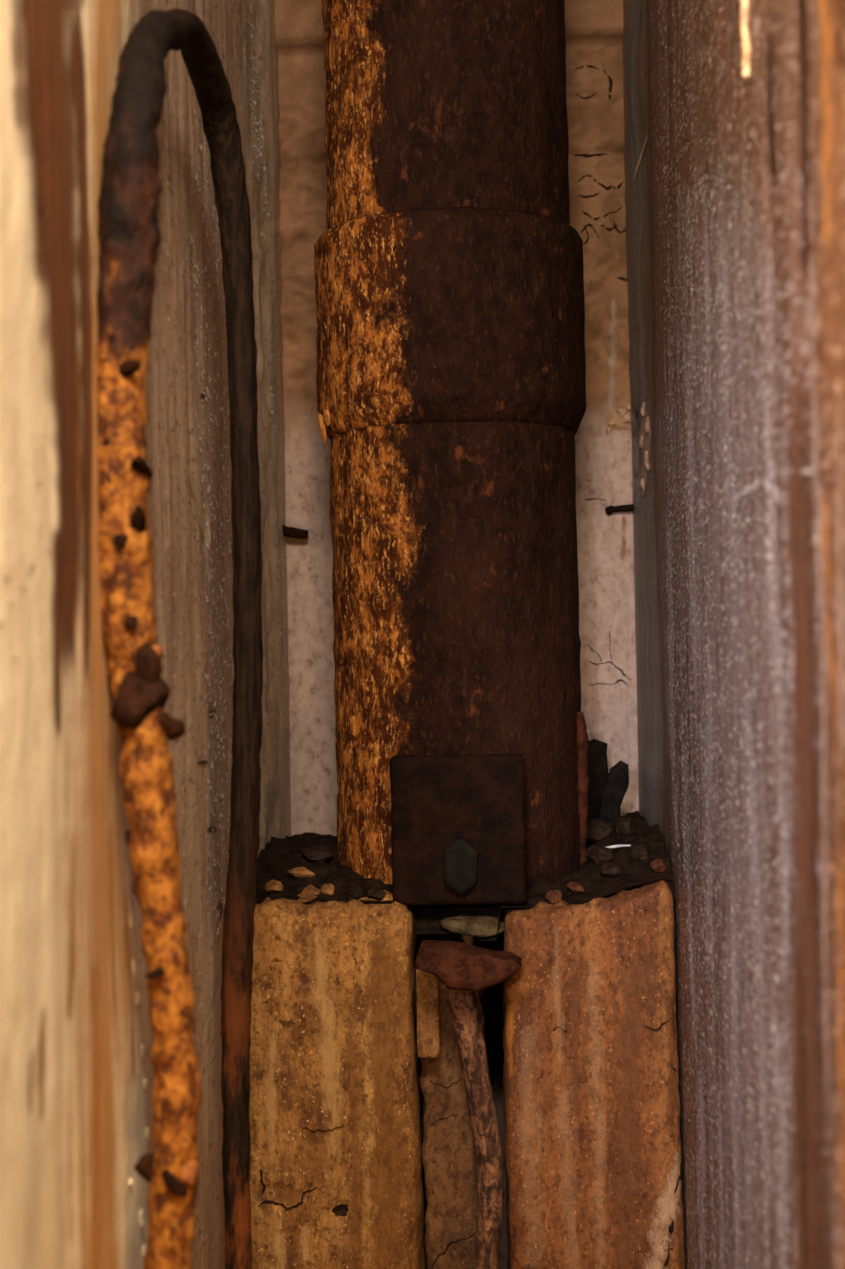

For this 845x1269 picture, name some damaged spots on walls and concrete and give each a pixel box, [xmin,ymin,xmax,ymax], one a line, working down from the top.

damp [797,0,808,270]
corrosion [317,409,330,445]
crack [588,633,631,688]
damp [660,157,829,1269]
crack [259,1169,316,1210]